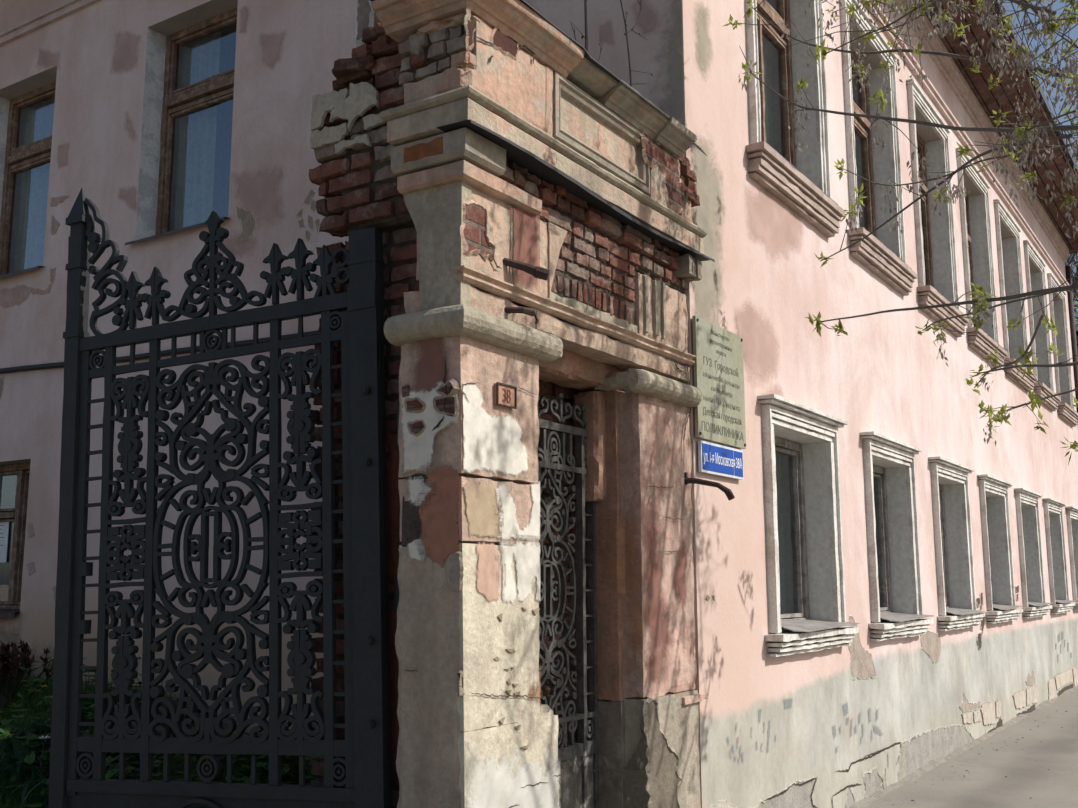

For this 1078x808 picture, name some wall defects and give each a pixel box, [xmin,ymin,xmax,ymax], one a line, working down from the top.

peeling [309,82,385,155]
flaking render [641,130,687,213]
flaking render [460,200,495,260]
peeling [0,268,56,308]
peeling [401,378,540,622]
water stain [602,512,673,681]
water stain [675,546,687,602]
peeling [494,649,535,696]
peeling [848,615,876,681]
spalling [605,698,683,808]
crack [765,736,916,808]
peeling [832,703,882,752]